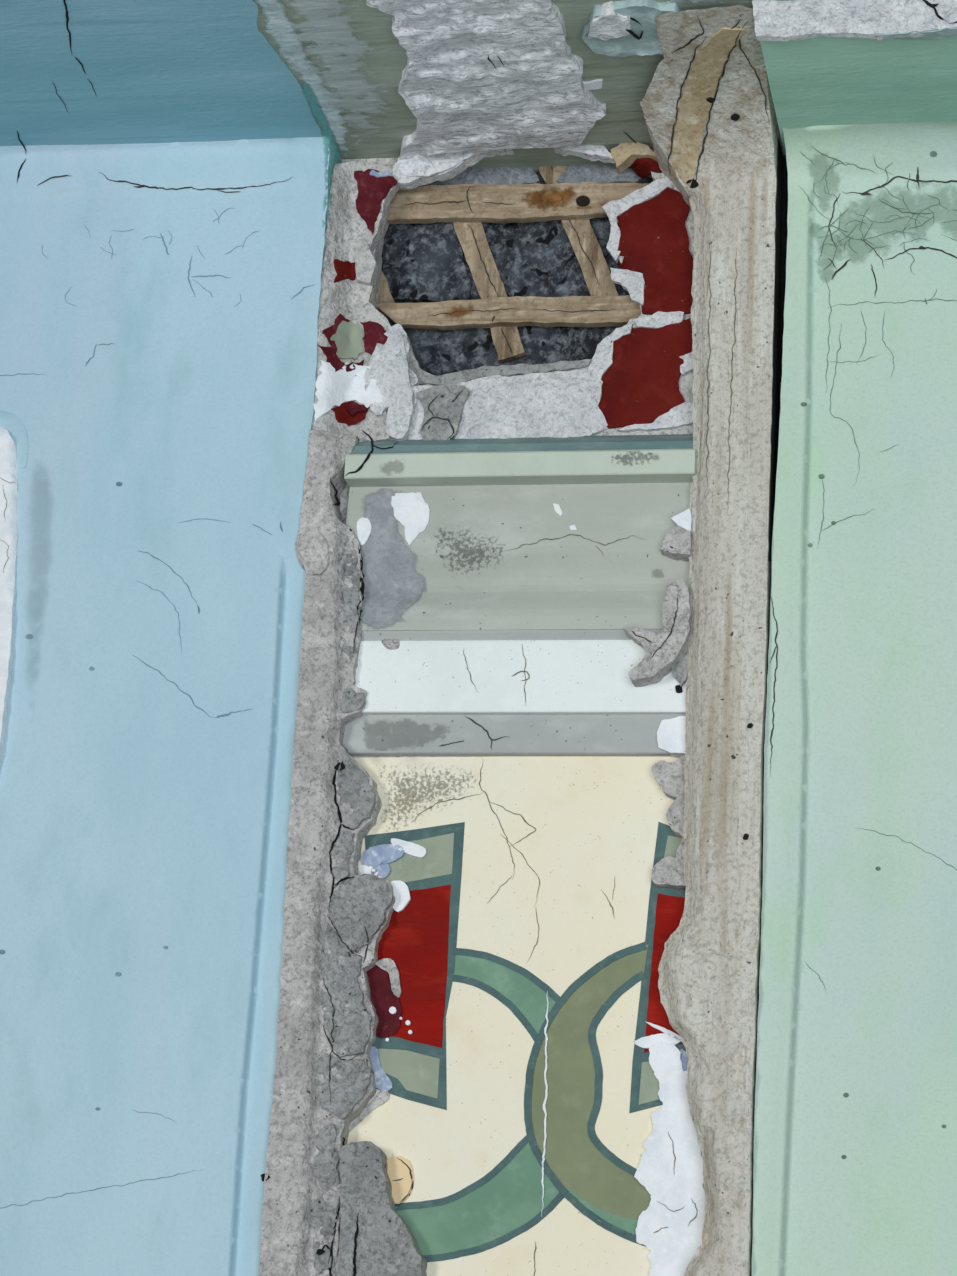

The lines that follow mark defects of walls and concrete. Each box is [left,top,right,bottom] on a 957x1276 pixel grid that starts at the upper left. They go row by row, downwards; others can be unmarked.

crack [63,0,97,97]
flaking render [752,0,957,41]
crack [17,132,69,186]
crack [84,172,289,306]
crack [668,16,957,561]
crack [179,518,283,535]
crack [505,534,646,556]
crack [133,551,250,718]
flaking render [258,0,723,1276]
crack [412,647,540,964]